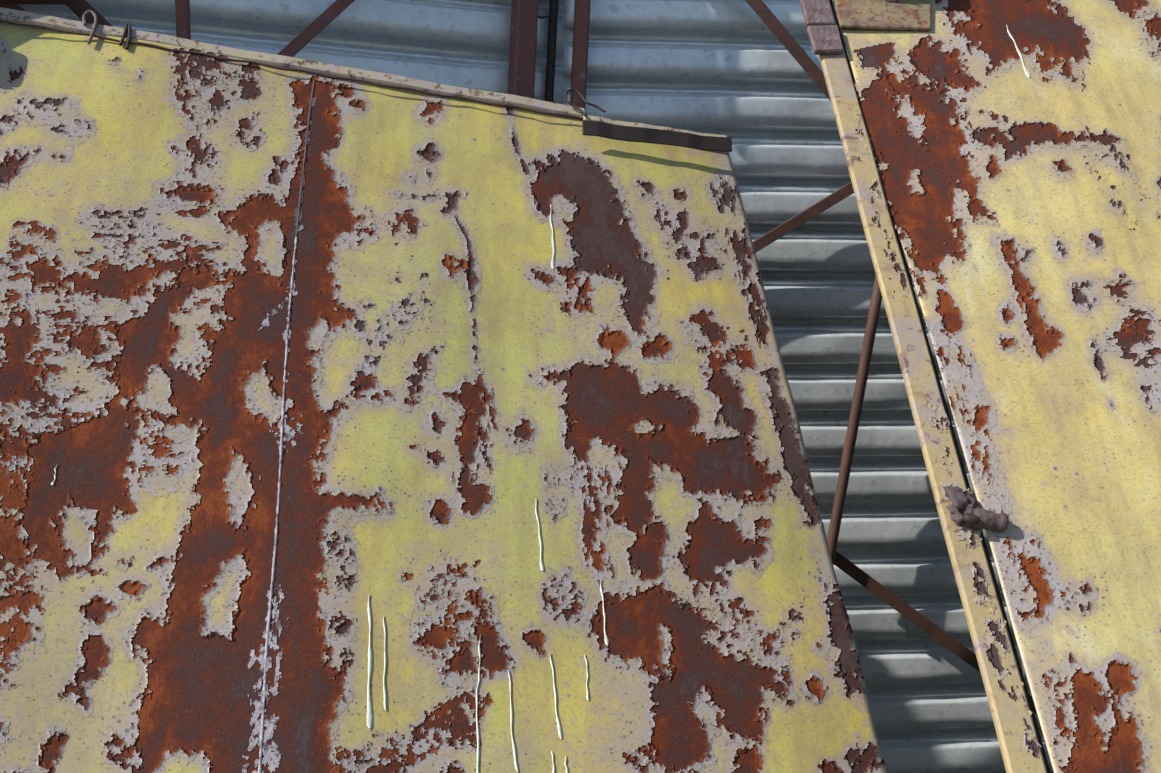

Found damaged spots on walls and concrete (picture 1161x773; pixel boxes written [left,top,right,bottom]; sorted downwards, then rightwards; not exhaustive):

corrosion [1106,0,1161,64]
peeling [160,47,268,188]
peeling [633,167,741,282]
corrosion [852,0,1131,361]
peeling [0,195,228,690]
peeling [58,550,171,718]
corrosion [16,74,499,773]
peeling [396,550,515,690]
corrosion [523,148,825,773]
peeling [923,316,1042,768]
corrosion [1041,651,1149,773]
peeling [1068,268,1161,412]